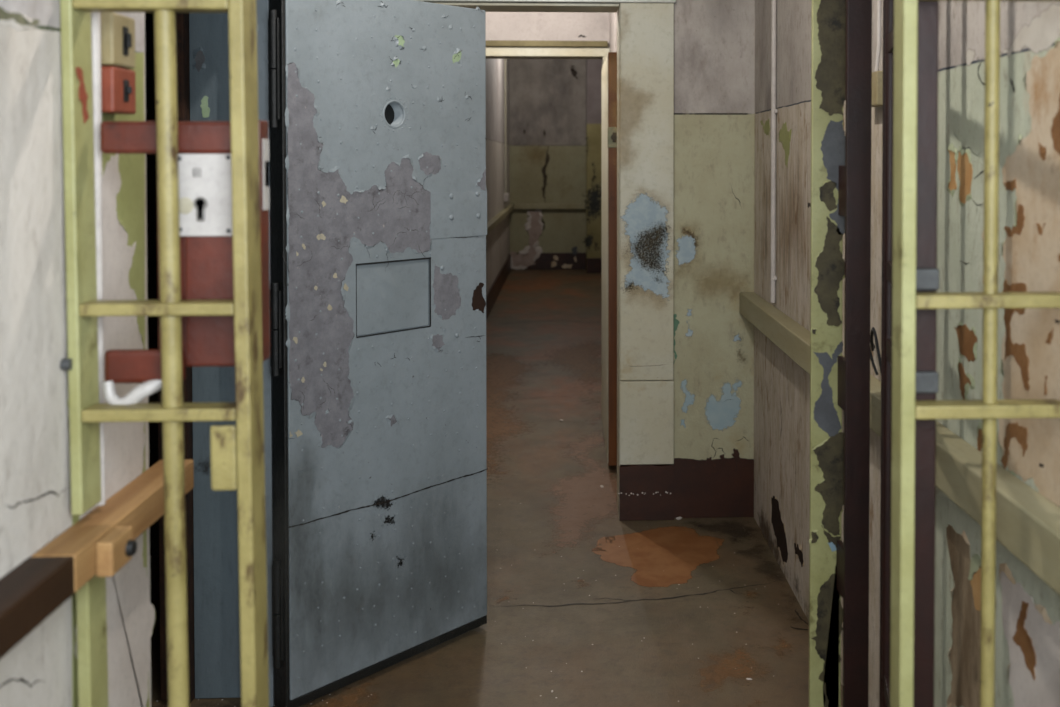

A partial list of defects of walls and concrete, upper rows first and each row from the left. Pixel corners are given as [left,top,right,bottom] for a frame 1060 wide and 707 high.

flaking render [102,154,137,300]
peeling [285,62,442,448]
crack [523,130,550,230]
peeling [620,193,696,301]
peeling [807,0,846,334]
flaking render [1001,37,1060,292]
flaking render [104,316,144,403]
flaking render [954,321,978,400]
flaking render [1000,308,1060,401]
peeling [771,341,844,707]
flaking render [106,533,156,707]
flaking render [946,524,981,707]